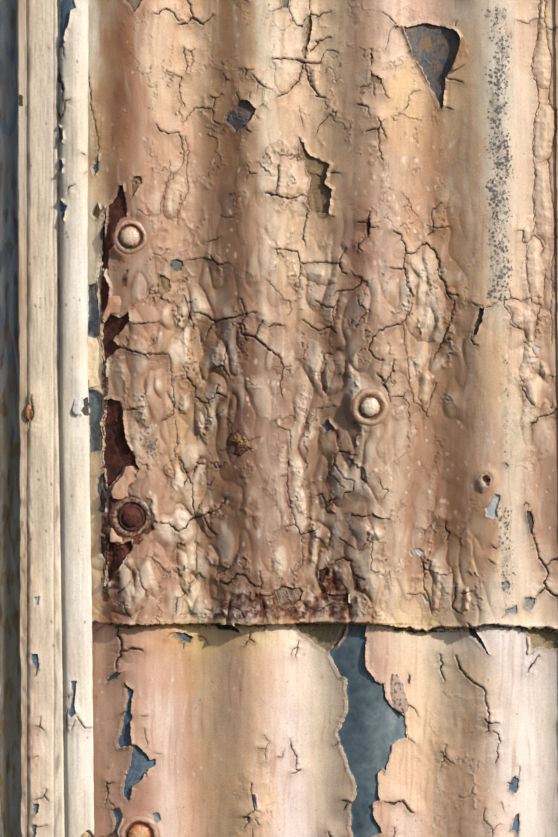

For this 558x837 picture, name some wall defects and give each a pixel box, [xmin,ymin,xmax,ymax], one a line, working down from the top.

peeling [56,0,80,48]
crack [154,0,338,223]
peeling [296,137,340,218]
peeling [385,15,469,112]
mould [485,7,513,301]
crack [476,1,557,358]
corrosion [96,181,154,602]
crack [123,152,455,614]
corrosion [212,568,359,620]
peeling [103,668,157,837]
peeling [294,623,417,837]
crack [440,655,501,763]